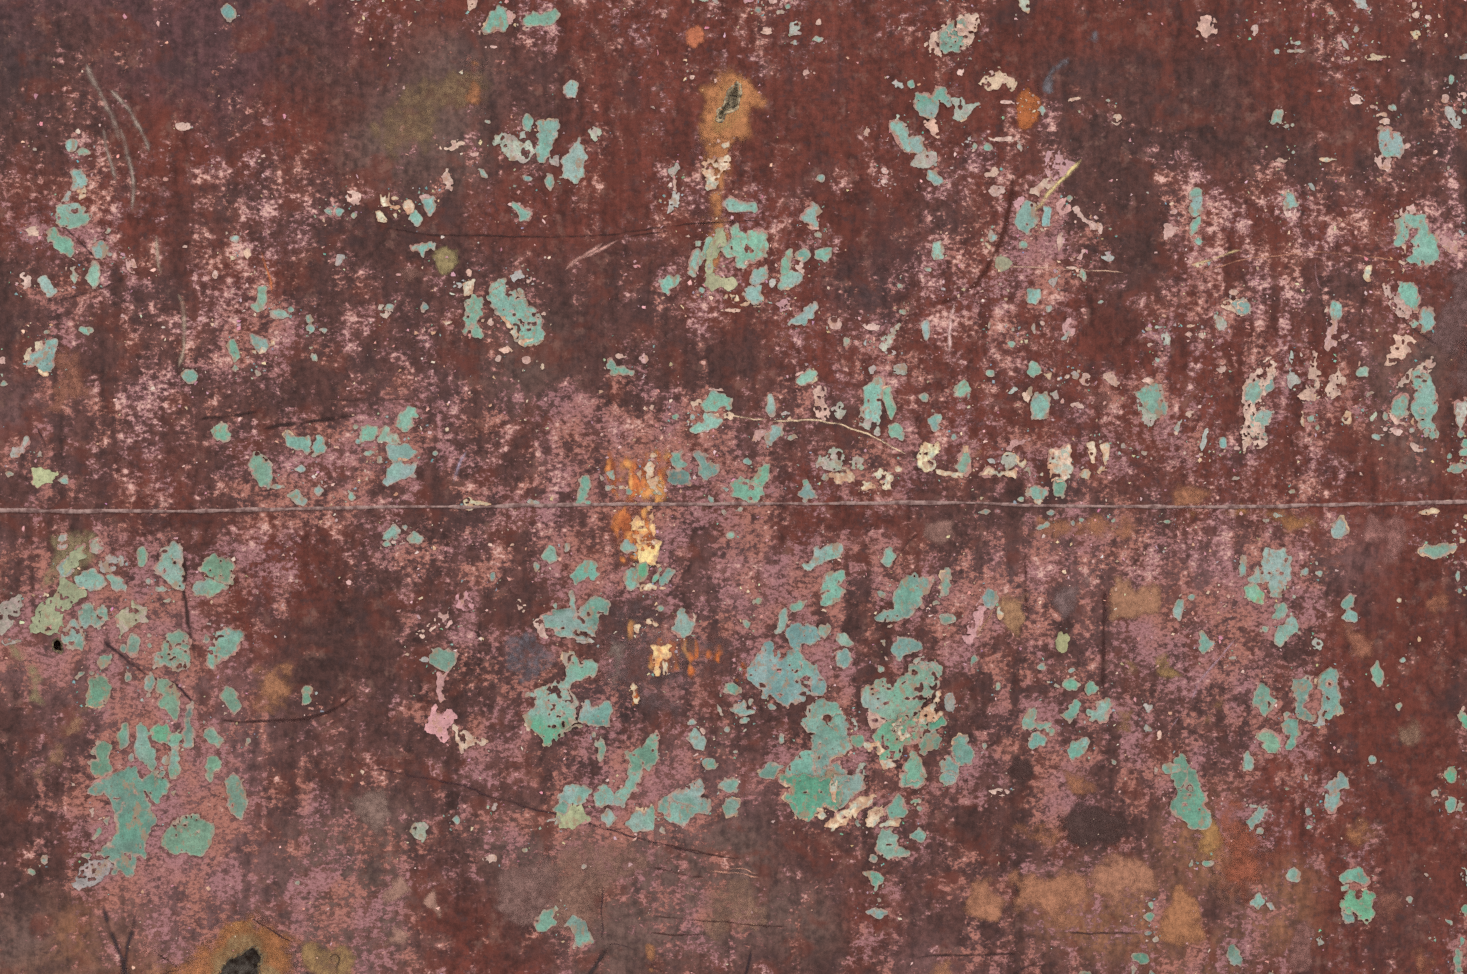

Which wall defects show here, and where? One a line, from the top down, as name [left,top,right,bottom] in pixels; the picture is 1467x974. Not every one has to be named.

corrosion [686,26,704,48]
corrosion [700,73,766,272]
corrosion [1017,90,1041,129]
peeling [889,12,1252,435]
peeling [658,141,1147,531]
peeling [1183,204,1467,474]
peeling [0,532,249,891]
peeling [517,543,613,762]
corrosion [605,452,672,562]
peeling [717,542,1004,919]
corrosion [1109,576,1161,621]
corrosion [966,854,1206,946]